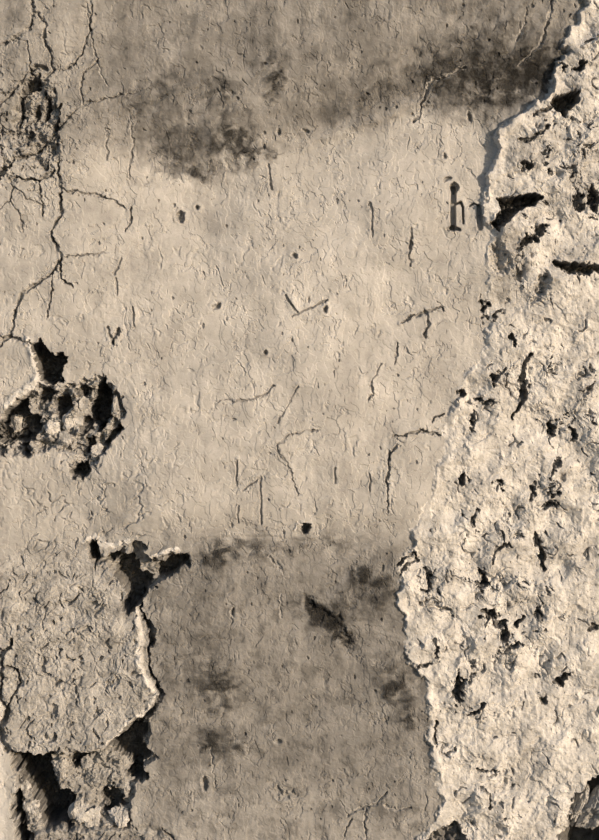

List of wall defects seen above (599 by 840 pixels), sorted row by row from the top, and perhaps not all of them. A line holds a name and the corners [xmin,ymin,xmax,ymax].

crack [0,0,137,348]
spalling [0,336,127,482]
spalling [395,0,599,840]
spalling [89,540,189,617]
crack [0,638,22,754]
spalling [9,751,177,840]
spalling [109,719,152,783]
flaking render [200,775,209,794]